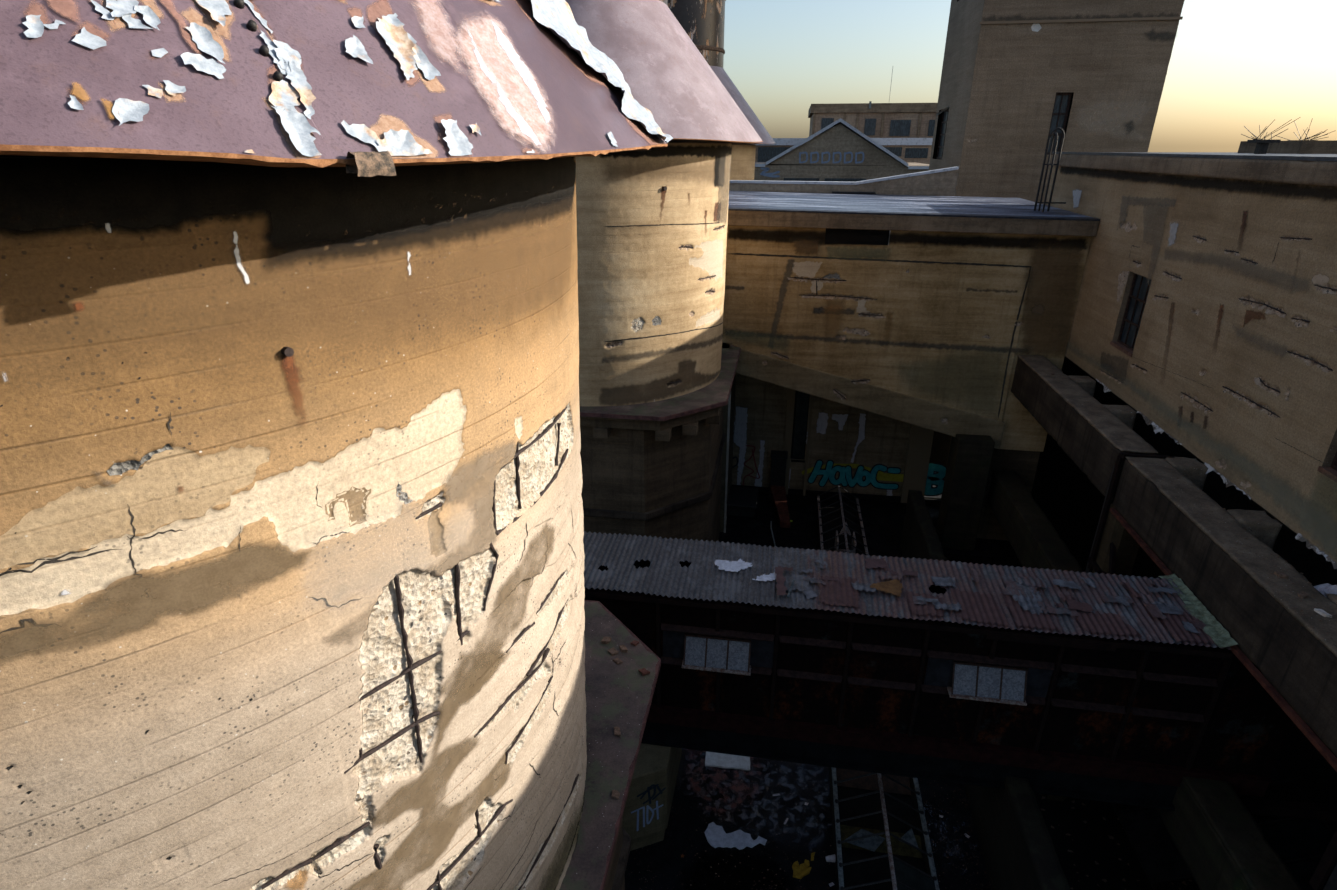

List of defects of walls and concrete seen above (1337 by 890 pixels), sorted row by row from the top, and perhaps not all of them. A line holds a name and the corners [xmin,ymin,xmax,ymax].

peeling [22,0,162,50]
peeling [151,0,322,158]
peeling [341,114,481,158]
peeling [481,0,673,145]
rust [281,347,301,401]
crack [0,504,186,576]
leakage [422,443,517,576]
crack [0,618,53,634]
leakage [0,545,307,662]
peeling [0,389,581,890]
leakage [331,627,354,642]
leakage [348,525,554,890]